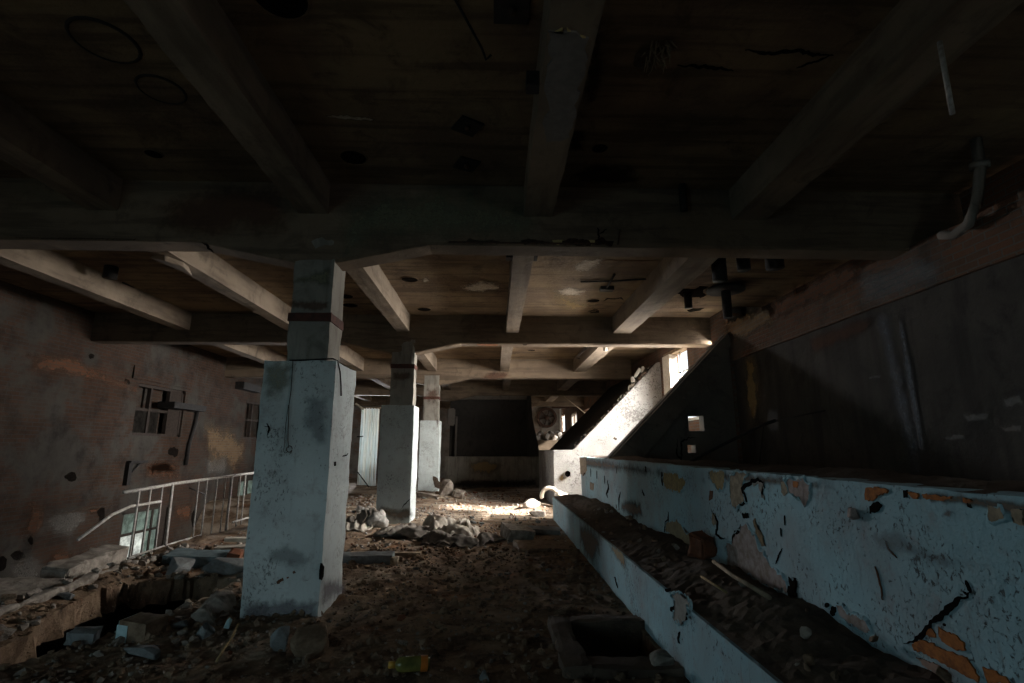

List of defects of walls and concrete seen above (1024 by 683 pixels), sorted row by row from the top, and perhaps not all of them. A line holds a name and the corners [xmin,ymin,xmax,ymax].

crack [677,49,833,71]
peeling [710,469,765,512]
crack [713,477,765,542]
peeling [781,475,813,507]
flaking render [864,486,889,514]
flaking render [908,492,973,503]
peeling [986,503,1024,526]
peeling [725,522,798,597]
peeling [665,588,693,627]
crack [903,580,972,644]
flaking render [912,627,1011,683]